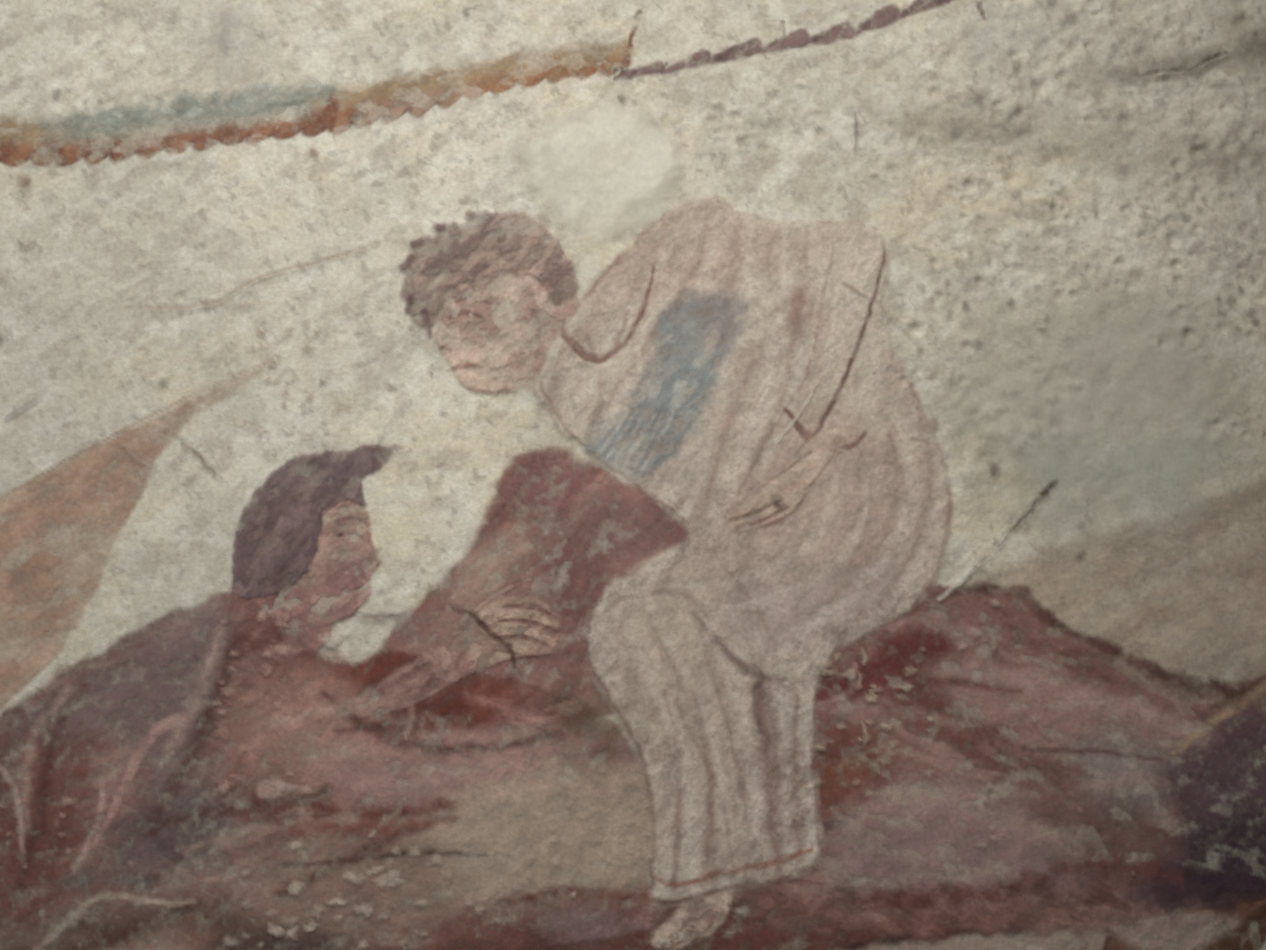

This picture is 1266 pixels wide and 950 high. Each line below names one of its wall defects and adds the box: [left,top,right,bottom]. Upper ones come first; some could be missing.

crack [939,482,1056,600]
crack [458,610,515,665]